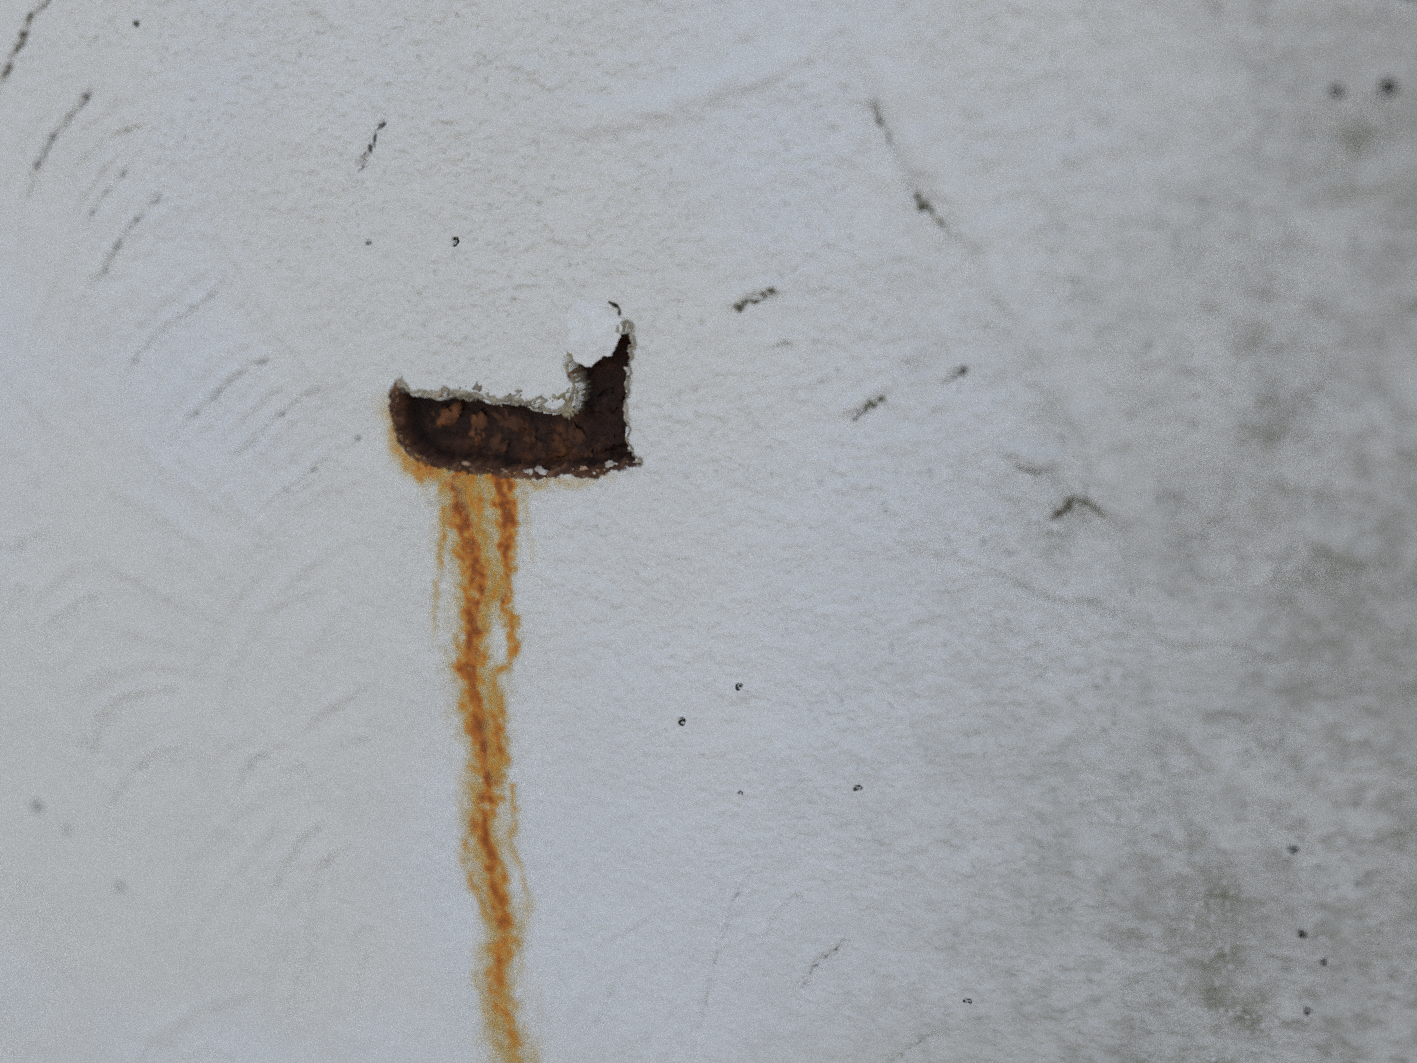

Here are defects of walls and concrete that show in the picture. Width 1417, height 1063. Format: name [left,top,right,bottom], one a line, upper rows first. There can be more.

flaking render [388,299,642,480]
corrosion [389,413,547,1063]